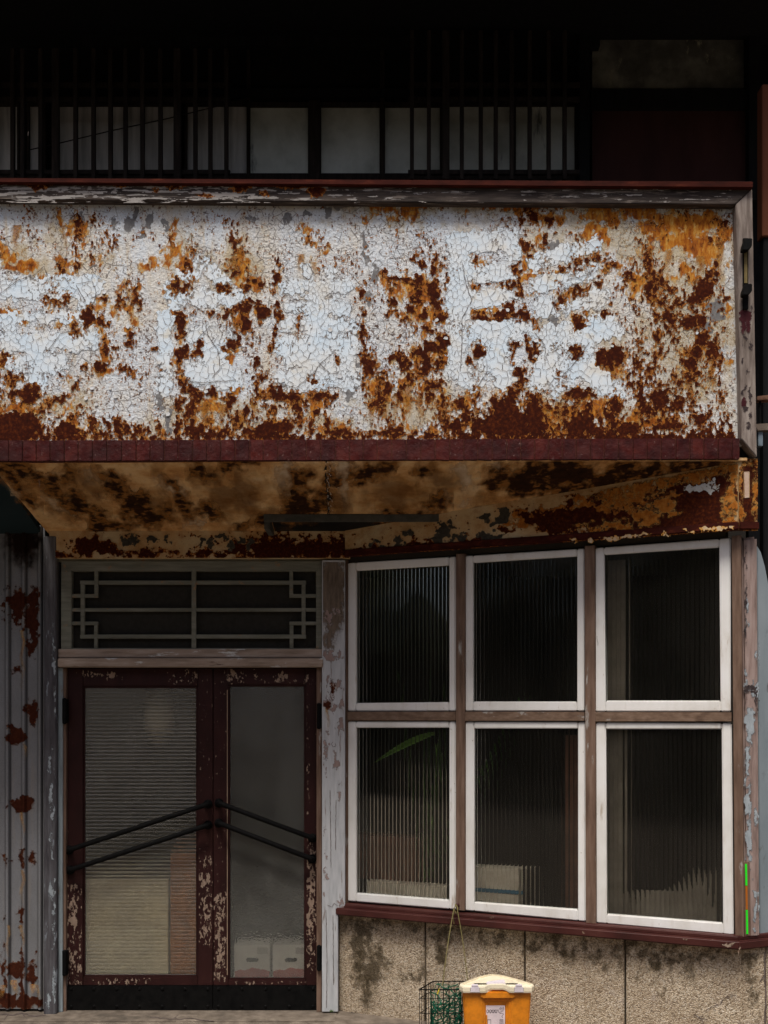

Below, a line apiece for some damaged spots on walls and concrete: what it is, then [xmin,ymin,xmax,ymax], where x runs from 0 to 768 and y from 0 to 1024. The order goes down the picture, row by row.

corrosion [0,462,498,567]
corrosion [480,459,758,542]
peeling [684,477,720,495]
corrosion [0,585,40,657]
corrosion [4,699,40,745]
peeling [743,669,760,861]
corrosion [6,795,34,819]
corrosion [2,848,36,875]
corrosion [0,908,43,1010]
leakage [345,916,394,1006]
leakage [408,922,721,978]
leakage [741,953,758,1005]